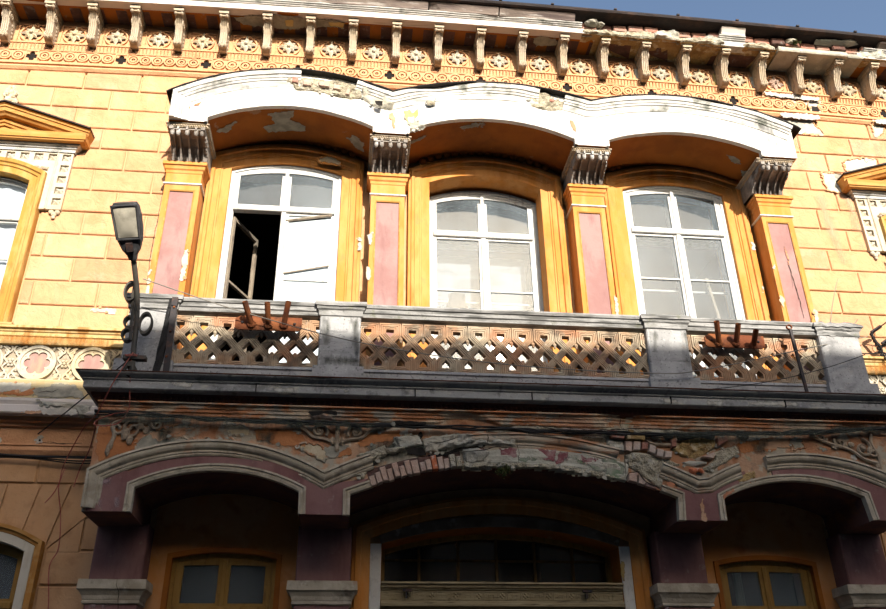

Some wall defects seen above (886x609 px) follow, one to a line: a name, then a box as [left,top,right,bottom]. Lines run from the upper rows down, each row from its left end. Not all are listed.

spalling [286,77,437,144]
spalling [527,93,564,111]
flaking render [765,80,829,137]
flaking render [820,157,877,194]
flaking render [0,381,91,418]
spalling [95,410,806,491]